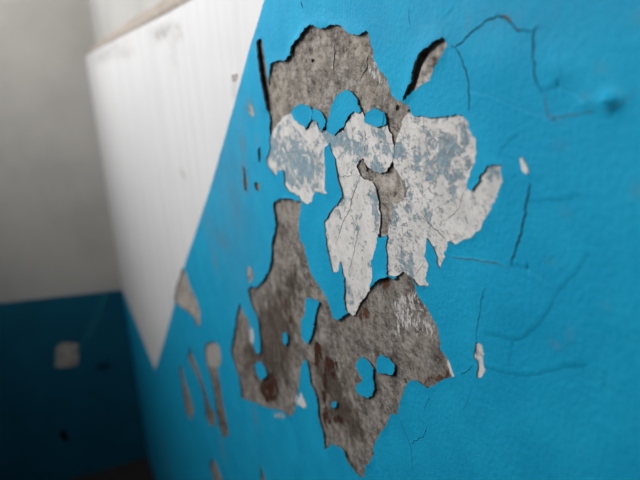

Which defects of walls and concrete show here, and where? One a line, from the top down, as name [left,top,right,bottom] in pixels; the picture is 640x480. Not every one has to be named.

peeling [175,270,200,325]
flaking render [232,25,503,477]
crack [444,14,639,411]
peeling [180,366,194,418]
peeling [188,342,229,436]